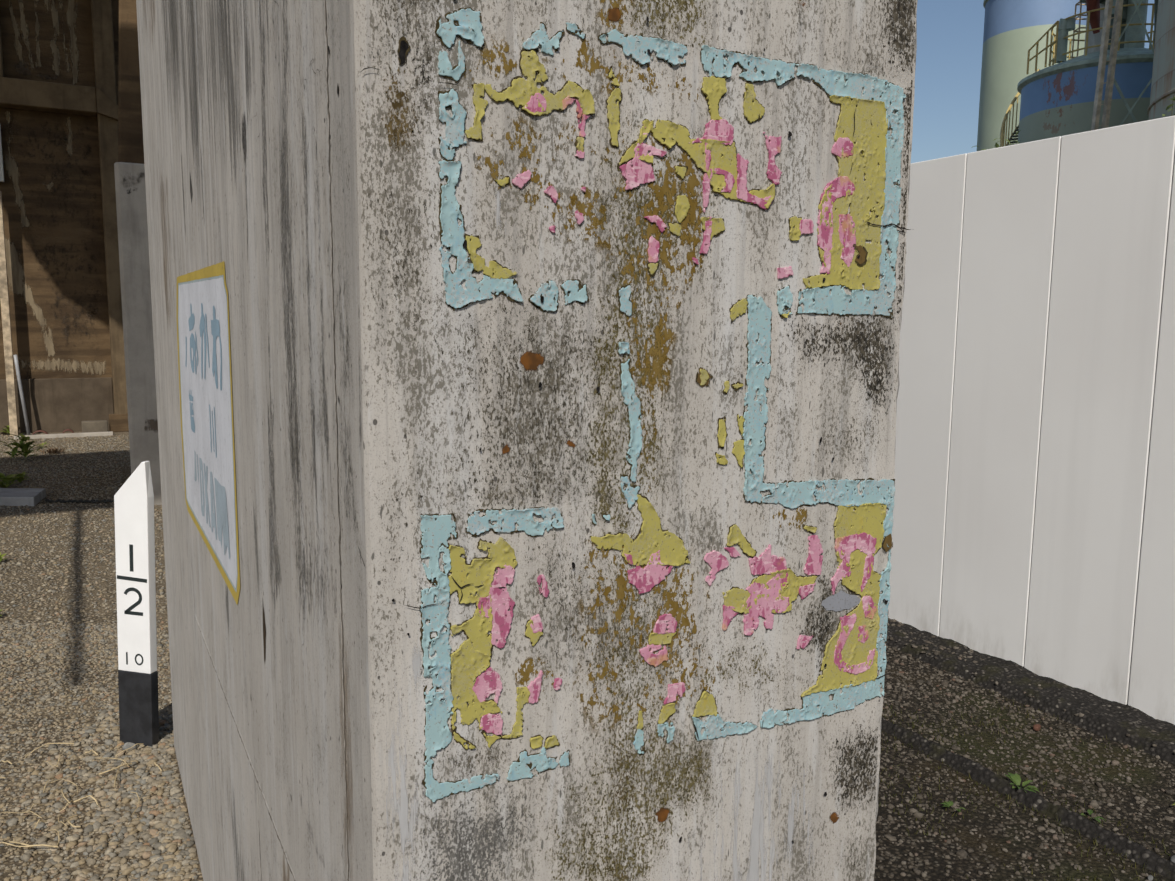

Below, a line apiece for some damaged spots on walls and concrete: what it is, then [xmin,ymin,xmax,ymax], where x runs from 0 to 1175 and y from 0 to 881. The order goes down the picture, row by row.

rust [598,0,634,30]
peeling [435,7,906,742]
peeling [407,506,570,802]
peeling [633,682,686,755]